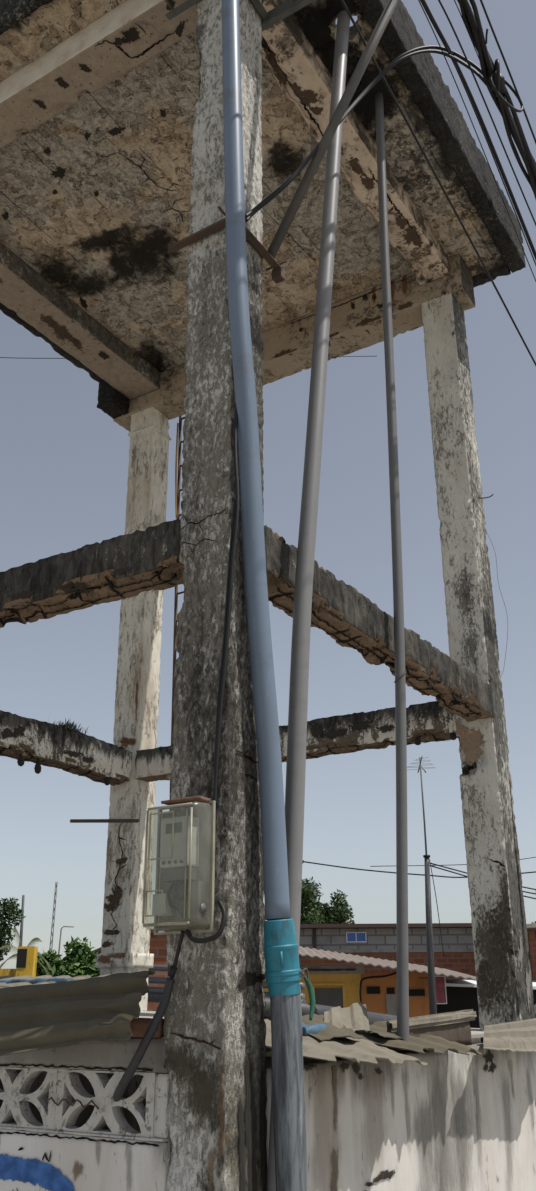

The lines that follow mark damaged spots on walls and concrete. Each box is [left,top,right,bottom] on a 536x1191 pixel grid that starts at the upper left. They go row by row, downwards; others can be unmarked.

crack [96,24,175,59]
spalling [262,39,323,116]
damp [269,139,306,180]
spalling [346,157,375,190]
damp [37,223,176,297]
crack [180,507,228,553]
spalling [0,567,177,626]
spalling [306,597,485,775]
spalling [0,725,111,783]
crack [111,825,127,937]
damp [472,861,519,1024]
peeling [365,1169,395,1191]